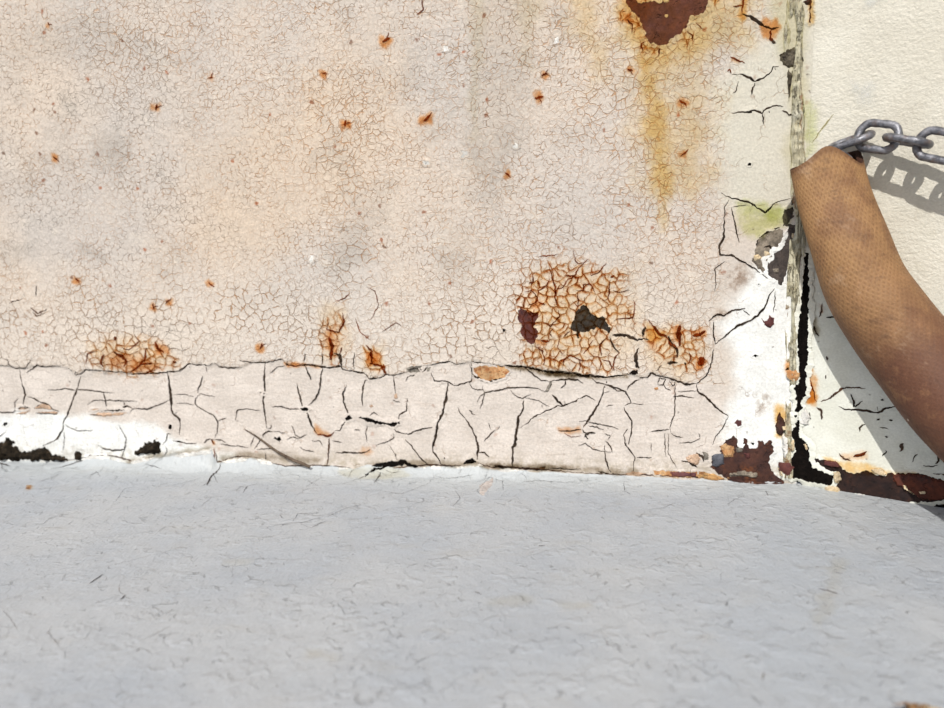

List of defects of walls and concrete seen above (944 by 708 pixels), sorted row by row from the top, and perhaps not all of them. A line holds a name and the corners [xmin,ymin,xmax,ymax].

corrosion [733,0,779,44]
peeling [749,203,801,291]
corrosion [517,250,635,372]
corrosion [85,335,176,377]
corrosion [318,313,385,375]
crack [0,190,794,522]
corrosion [646,319,705,371]
peeling [681,432,789,484]